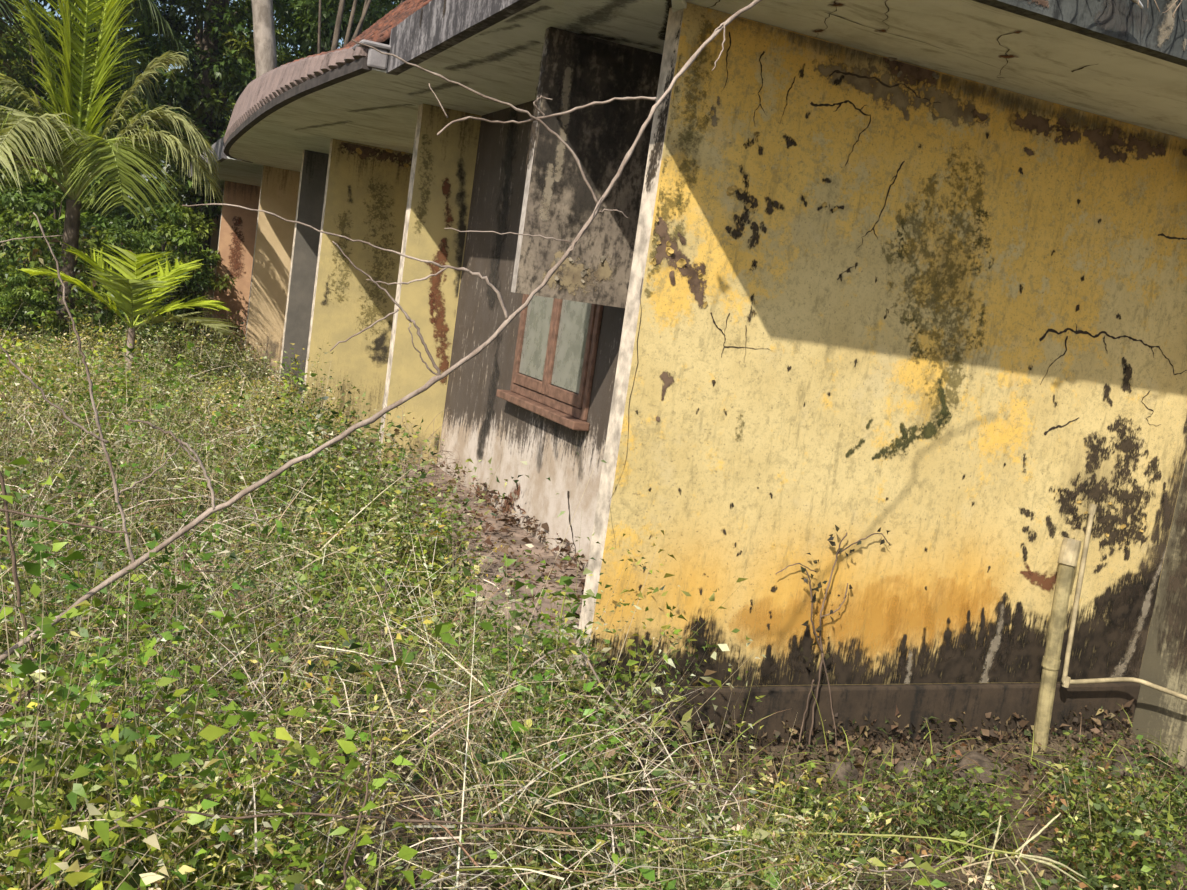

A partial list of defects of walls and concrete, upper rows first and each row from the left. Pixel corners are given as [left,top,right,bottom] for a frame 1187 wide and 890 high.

leakage [423,0,683,309]
crack [753,51,871,166]
corrosion [428,178,454,383]
flaking render [652,216,708,308]
peeling [725,165,785,270]
crack [837,161,905,280]
leakage [477,335,502,458]
leakage [872,378,952,460]
crack [1044,418,1078,435]
crack [1039,323,1187,385]
leakage [1019,357,1187,682]
leakage [586,593,1049,687]